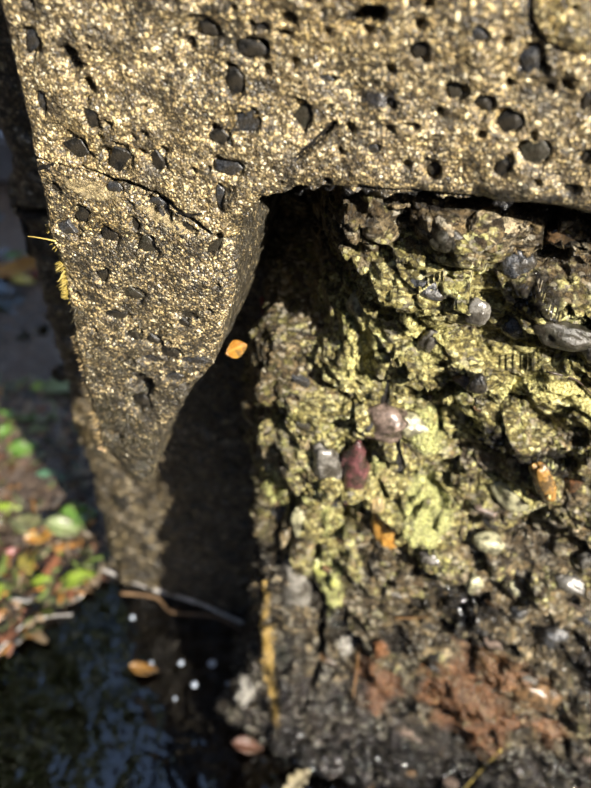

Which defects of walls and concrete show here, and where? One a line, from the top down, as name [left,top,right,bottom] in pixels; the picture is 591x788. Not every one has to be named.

crack [37,162,55,171]
crack [294,121,337,162]
crack [156,204,202,239]
spalling [215,185,591,788]
rust [357,653,404,716]
rust [418,638,567,754]